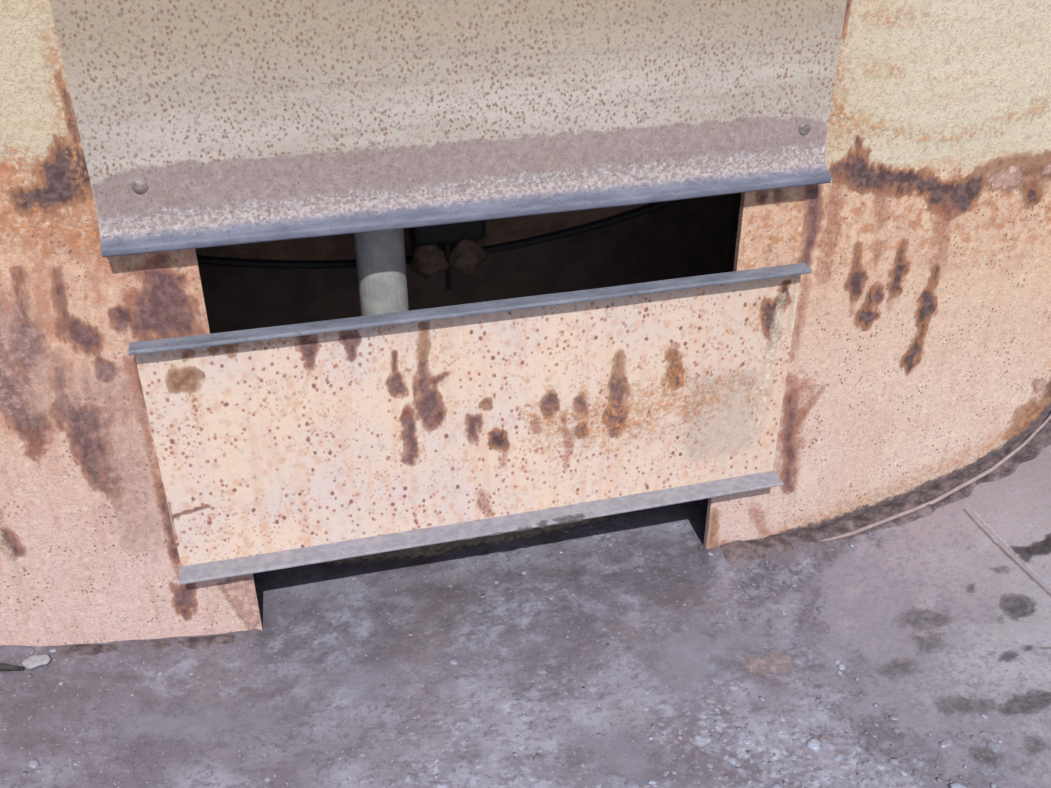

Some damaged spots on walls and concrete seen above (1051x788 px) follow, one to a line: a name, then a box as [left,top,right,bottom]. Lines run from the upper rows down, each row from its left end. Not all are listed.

rust [0,31,102,255]
rust [752,55,1051,376]
rust [107,255,205,341]
rust [0,266,198,620]
rust [386,321,449,465]
rust [466,397,510,466]
rust [521,342,744,462]
crack [963,509,1051,595]
water stain [1012,533,1051,562]
water stain [999,594,1036,620]
water stain [1000,645,1034,661]
water stain [938,691,1051,715]